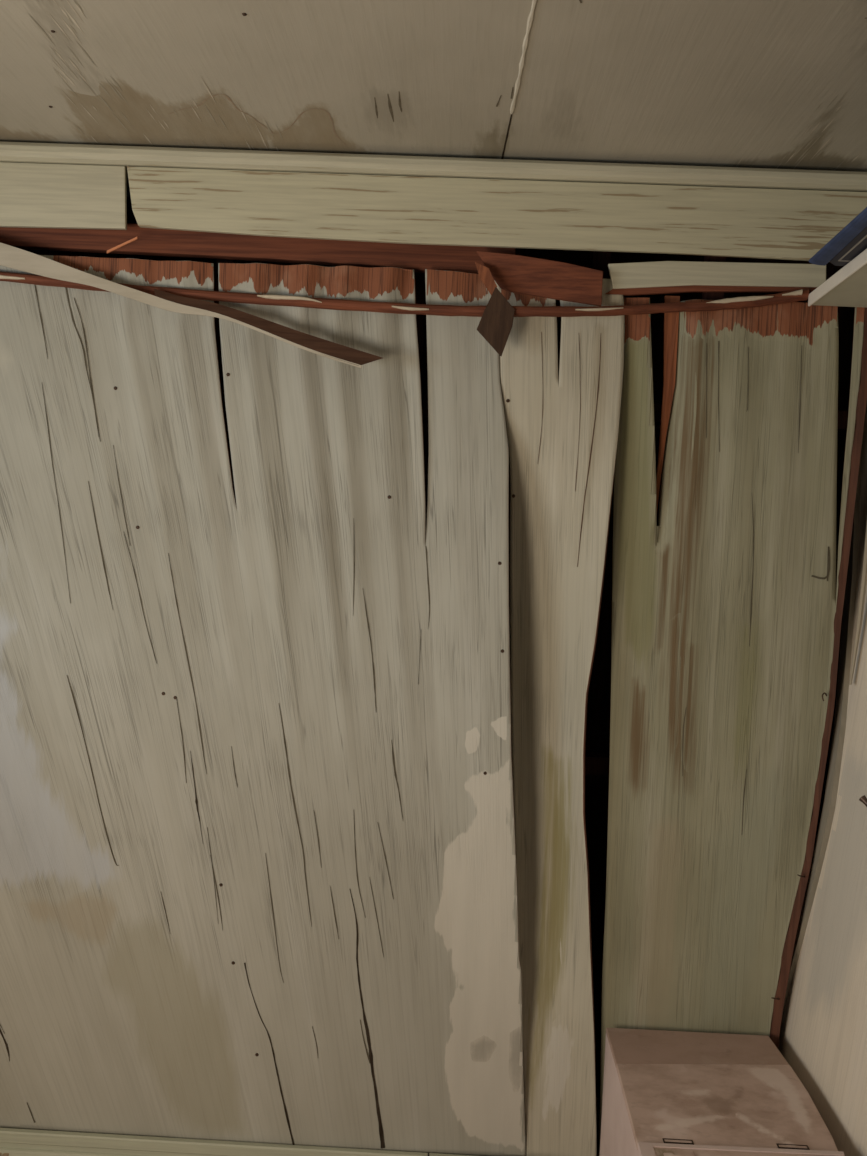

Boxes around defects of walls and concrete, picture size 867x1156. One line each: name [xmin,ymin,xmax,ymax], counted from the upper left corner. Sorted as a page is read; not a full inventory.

damp [0,75,386,155]
crack [496,87,513,159]
peeling [48,256,555,311]
peeling [678,290,838,350]
crack [34,285,71,603]
crack [65,287,157,663]
crack [67,675,119,866]
crack [168,553,238,931]
crack [353,571,376,708]
damp [569,320,799,1034]
crack [279,706,403,1148]
crack [244,963,294,1145]